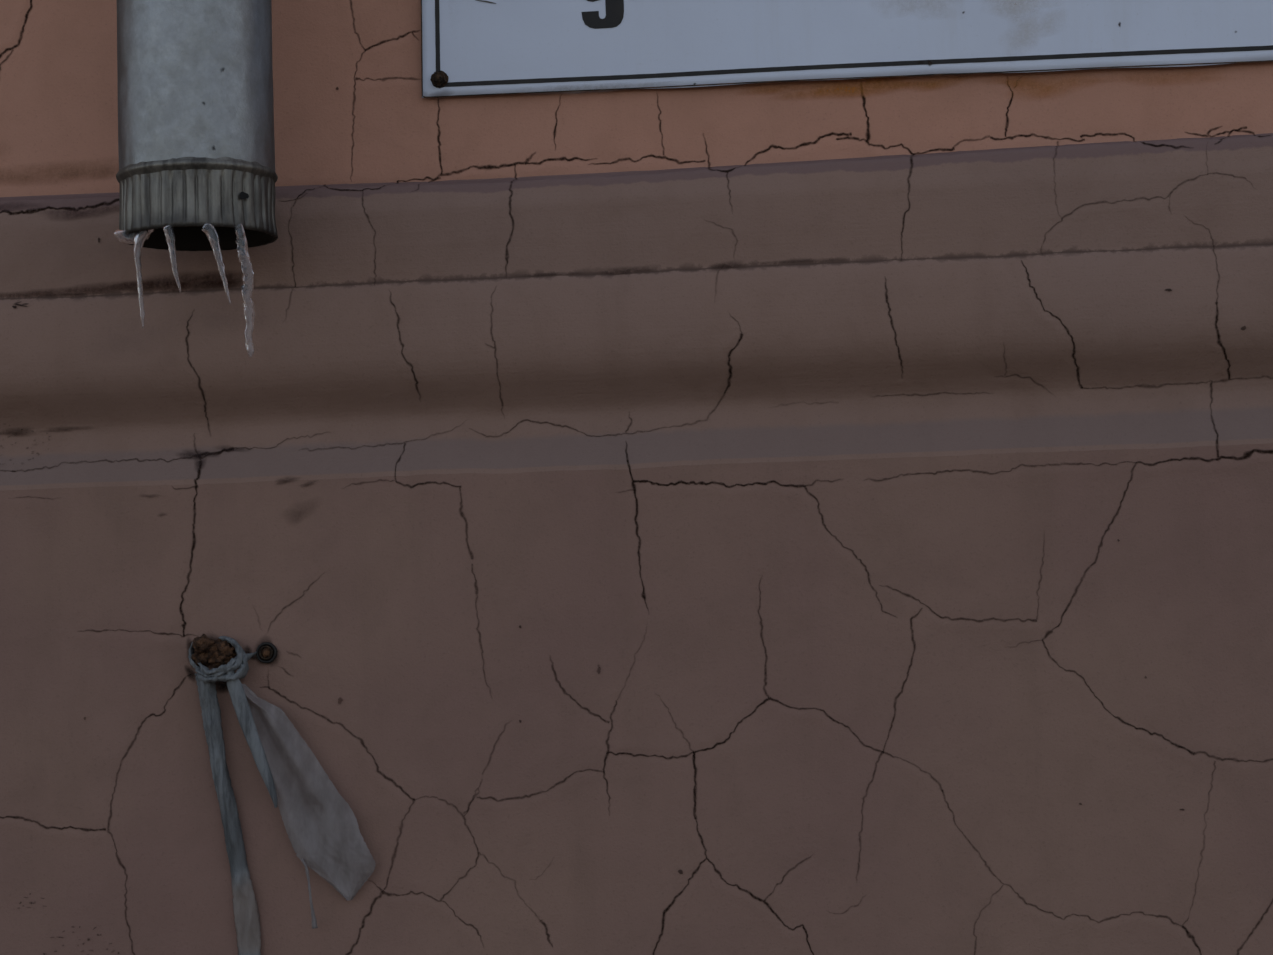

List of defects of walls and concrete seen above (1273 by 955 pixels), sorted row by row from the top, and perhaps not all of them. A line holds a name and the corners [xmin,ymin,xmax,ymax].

crack [0,0,32,70]
crack [0,199,119,215]
crack [288,2,1270,287]
crack [91,320,274,637]
crack [347,262,1273,955]
crack [124,678,185,757]
crack [269,688,415,809]
crack [0,789,135,955]